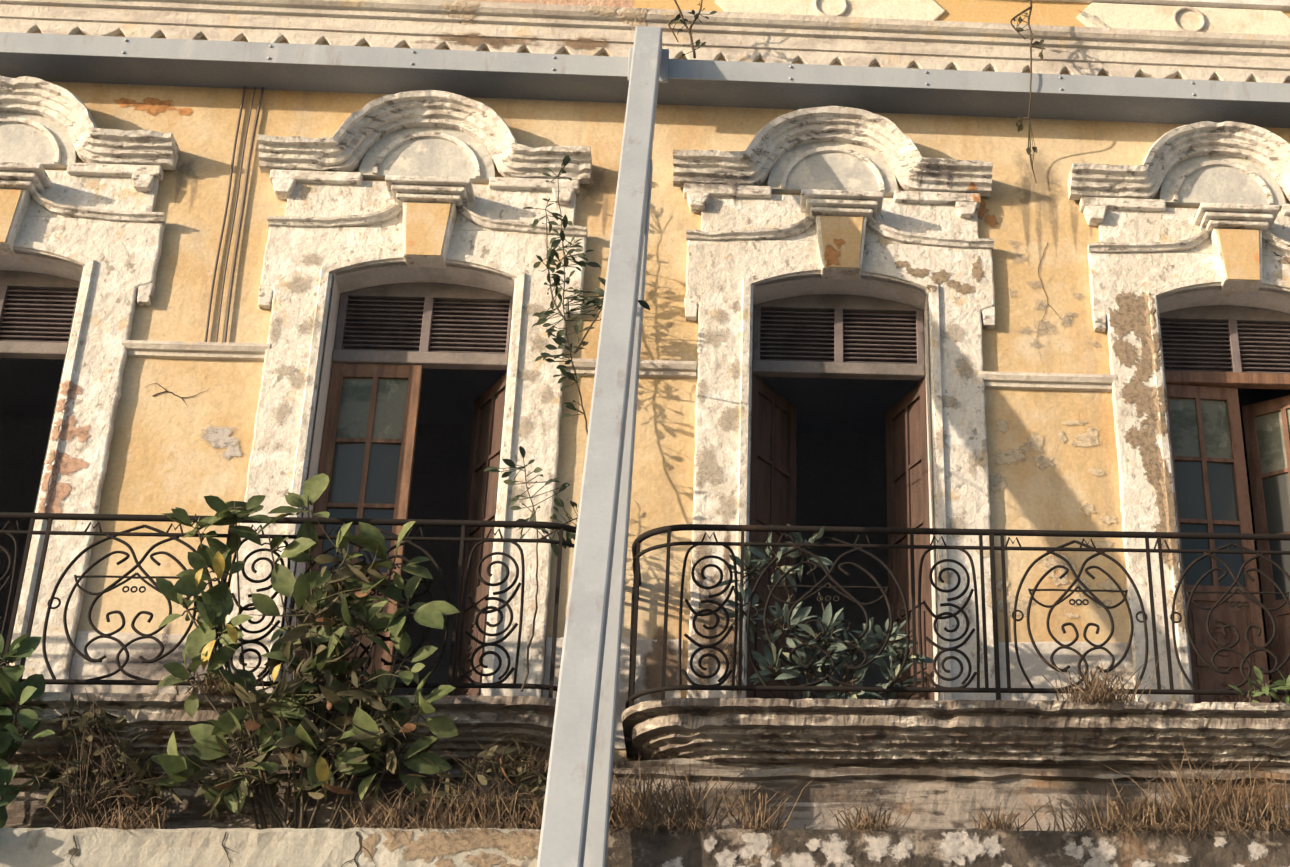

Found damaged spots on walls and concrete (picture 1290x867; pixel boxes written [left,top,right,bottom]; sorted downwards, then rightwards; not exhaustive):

peeling [115,97,192,115]
crack [146,383,209,404]
peeling [38,381,90,521]
peeling [1108,289,1187,633]
peeling [985,579,1036,616]
peeling [1038,554,1123,618]
crack [222,832,237,867]
crack [341,831,376,867]
peeling [361,828,541,867]
peeling [939,829,1012,867]
peeling [1064,836,1155,867]
peeling [1234,841,1268,867]